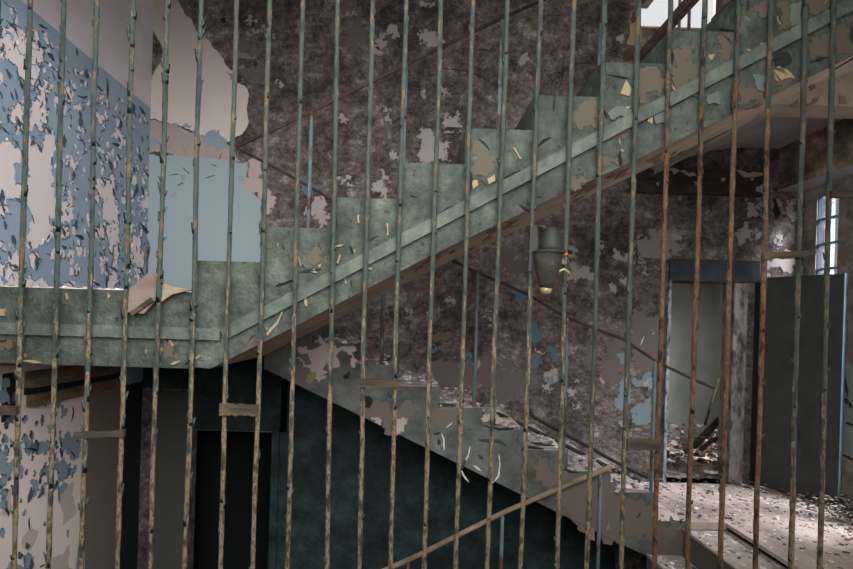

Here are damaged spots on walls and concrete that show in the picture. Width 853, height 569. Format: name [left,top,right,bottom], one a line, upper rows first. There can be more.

peeling [374,24,400,56]
peeling [417,28,446,49]
peeling [707,0,734,61]
peeling [0,0,277,300]
peeling [416,110,464,163]
peeling [371,169,391,199]
peeling [303,193,338,228]
peeling [567,245,594,284]
spalling [295,337,357,385]
peeling [541,365,559,397]
peeling [365,392,421,436]
peeling [0,353,84,569]